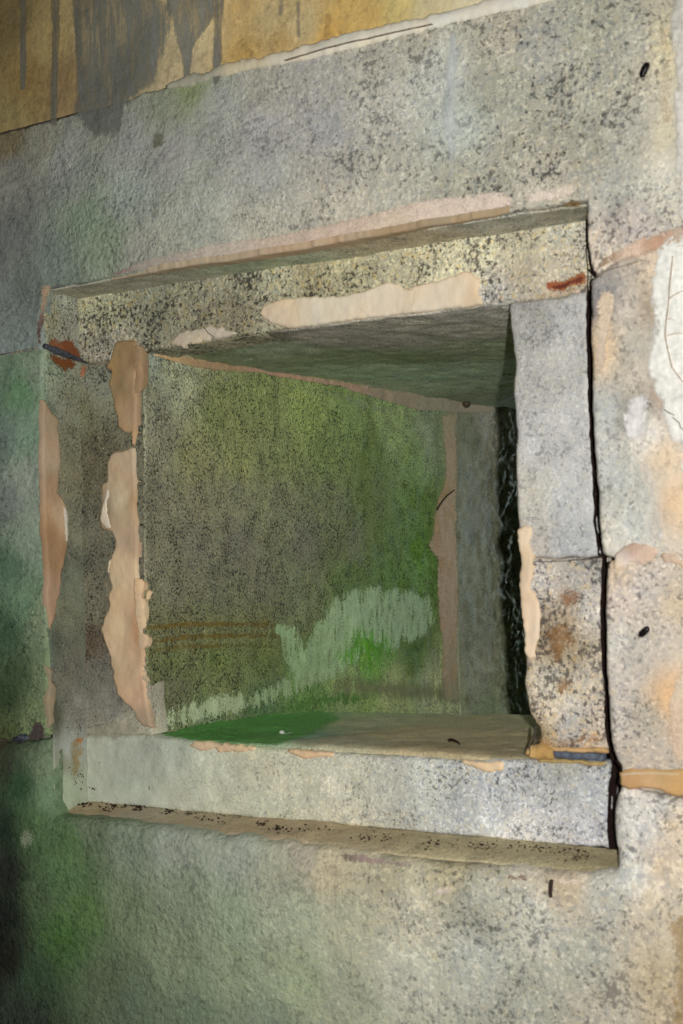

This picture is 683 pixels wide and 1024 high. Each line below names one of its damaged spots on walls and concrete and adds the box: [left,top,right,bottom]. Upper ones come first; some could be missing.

water stain [50,0,60,125]
water stain [73,0,224,134]
corrosion [541,273,586,298]
corrosion [49,338,86,376]
peeling [100,489,111,528]
crack [533,220,679,849]
peeling [134,578,156,718]
peeling [538,745,609,766]